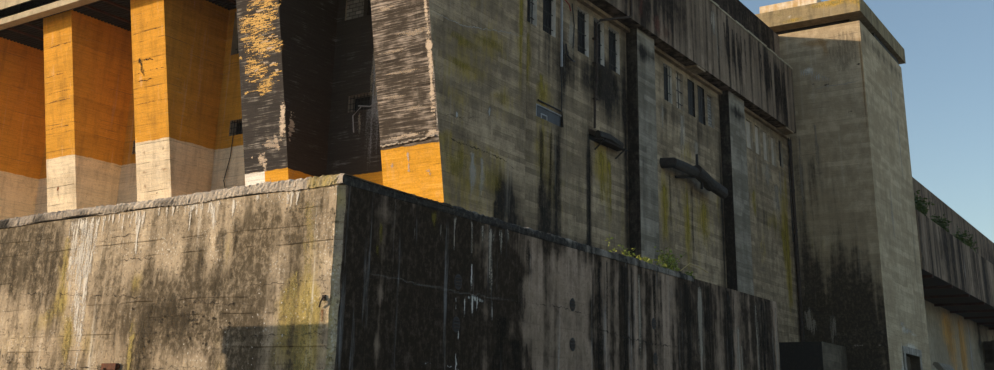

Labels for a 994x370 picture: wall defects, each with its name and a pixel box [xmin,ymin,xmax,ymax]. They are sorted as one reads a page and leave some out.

peeling [238,0,283,96]
damp [67,211,145,369]
damp [158,199,237,303]
damp [471,222,510,285]
damp [592,261,662,370]
damp [682,282,743,370]